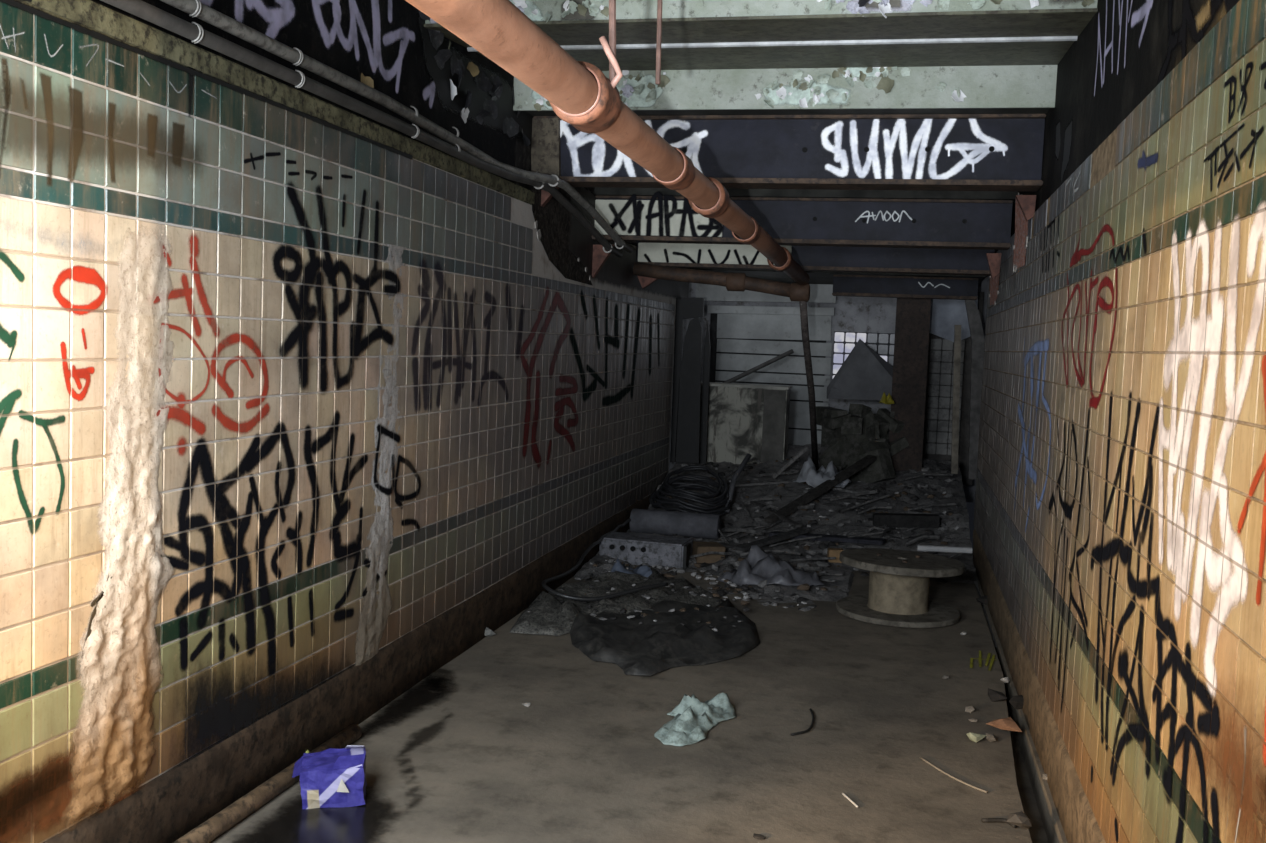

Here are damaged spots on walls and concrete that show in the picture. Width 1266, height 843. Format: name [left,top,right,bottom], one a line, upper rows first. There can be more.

peeling [510,0,609,22]
peeling [817,0,950,18]
peeling [1196,0,1210,30]
peeling [417,10,552,146]
peeling [616,70,670,107]
peeling [755,66,910,108]
leakage [355,243,407,666]
leakage [63,232,174,829]
leakage [351,669,456,744]
leakage [402,716,448,773]
corrosion [0,746,80,843]
leakage [233,786,418,843]